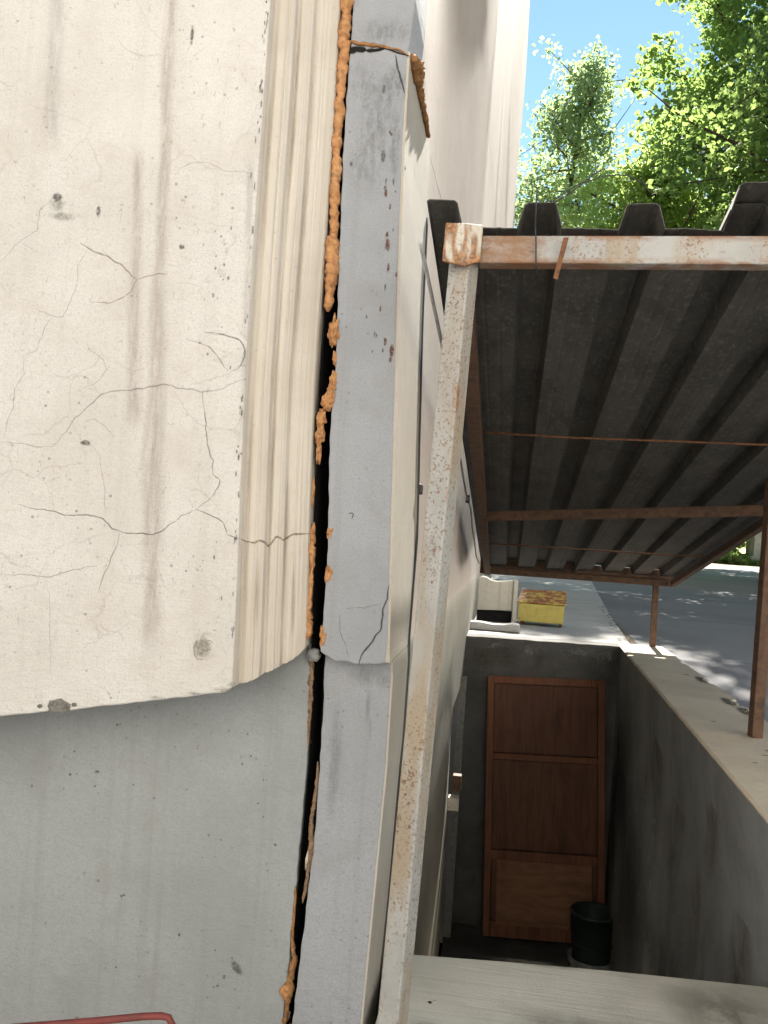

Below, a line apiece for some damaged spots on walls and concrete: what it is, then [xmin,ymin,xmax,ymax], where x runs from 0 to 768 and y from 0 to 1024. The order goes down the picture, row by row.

crack [82,244,162,303]
crack [5,393,309,674]
crack [279,586,389,1024]